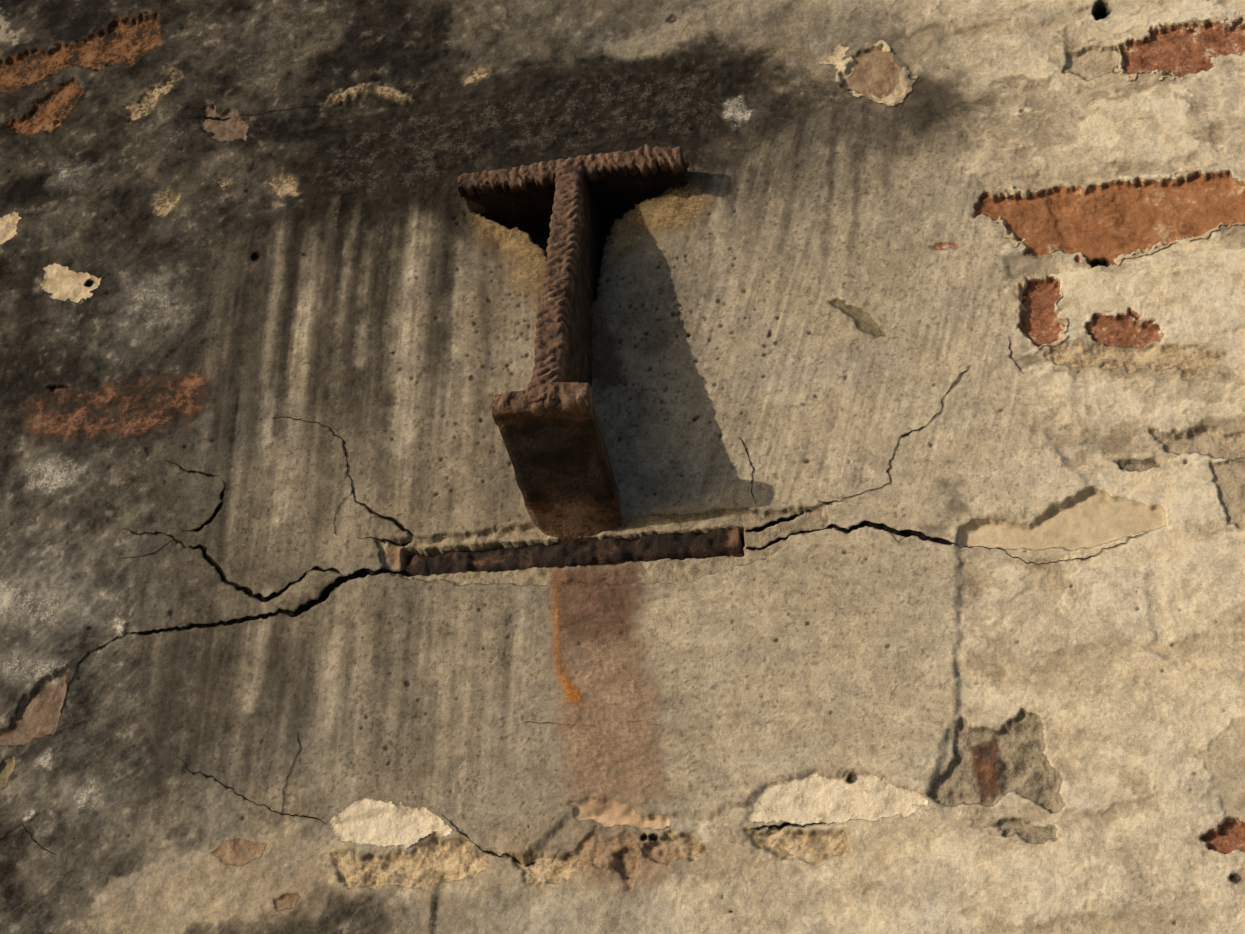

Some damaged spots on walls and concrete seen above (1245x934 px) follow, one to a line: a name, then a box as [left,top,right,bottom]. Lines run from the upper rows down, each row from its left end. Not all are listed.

flaking render [1062,15,1245,81]
leakage [725,96,750,125]
leakage [306,193,341,411]
rust [478,217,546,293]
rust [608,183,709,262]
flaking render [974,166,1245,268]
peeling [1014,275,1226,380]
crack [740,364,1147,565]
crack [25,417,414,735]
rust [552,568,659,804]
spalling [744,709,1065,864]
spalling [330,798,489,891]